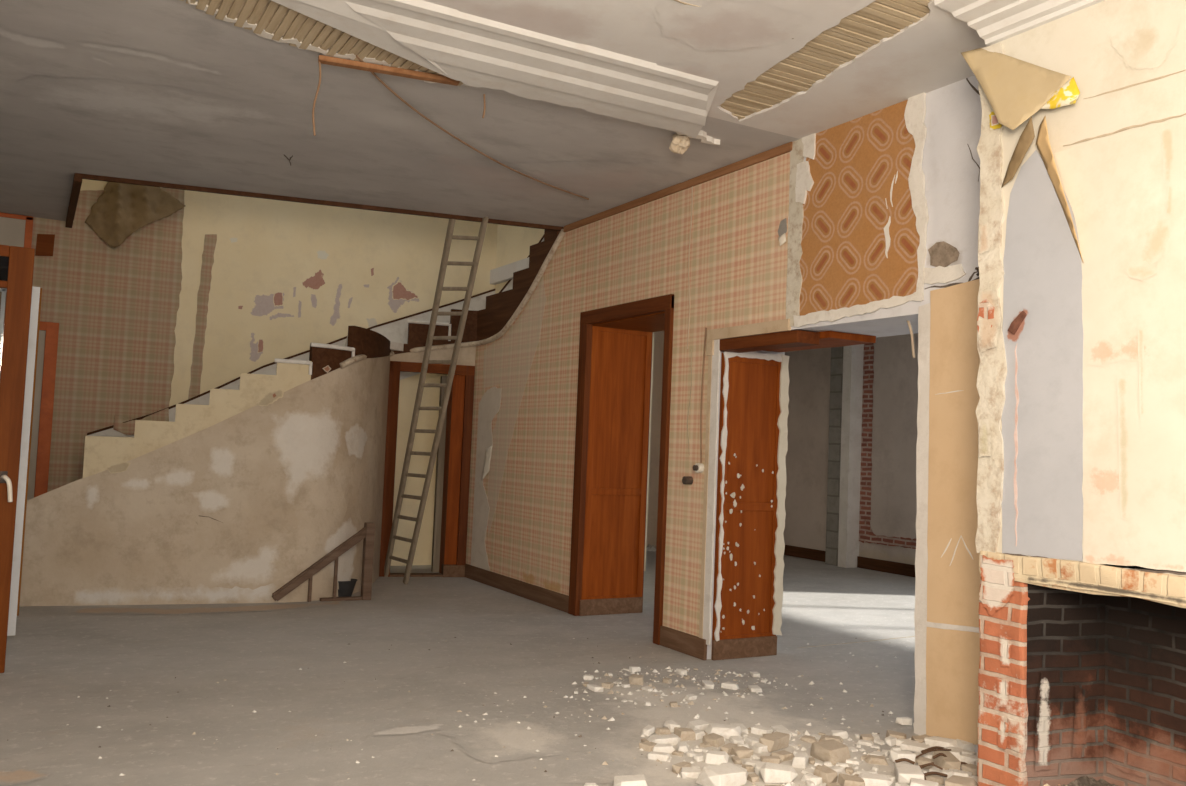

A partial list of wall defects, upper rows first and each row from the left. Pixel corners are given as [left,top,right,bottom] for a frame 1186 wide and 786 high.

flaking render [181,0,442,83]
flaking render [719,0,930,120]
peeling [249,331,264,362]
peeling [238,267,374,327]
peeling [386,276,422,314]
peeling [924,83,1008,553]
peeling [82,442,242,516]
peeling [264,399,368,514]
peeling [471,387,502,571]
corrosion [1005,306,1030,546]